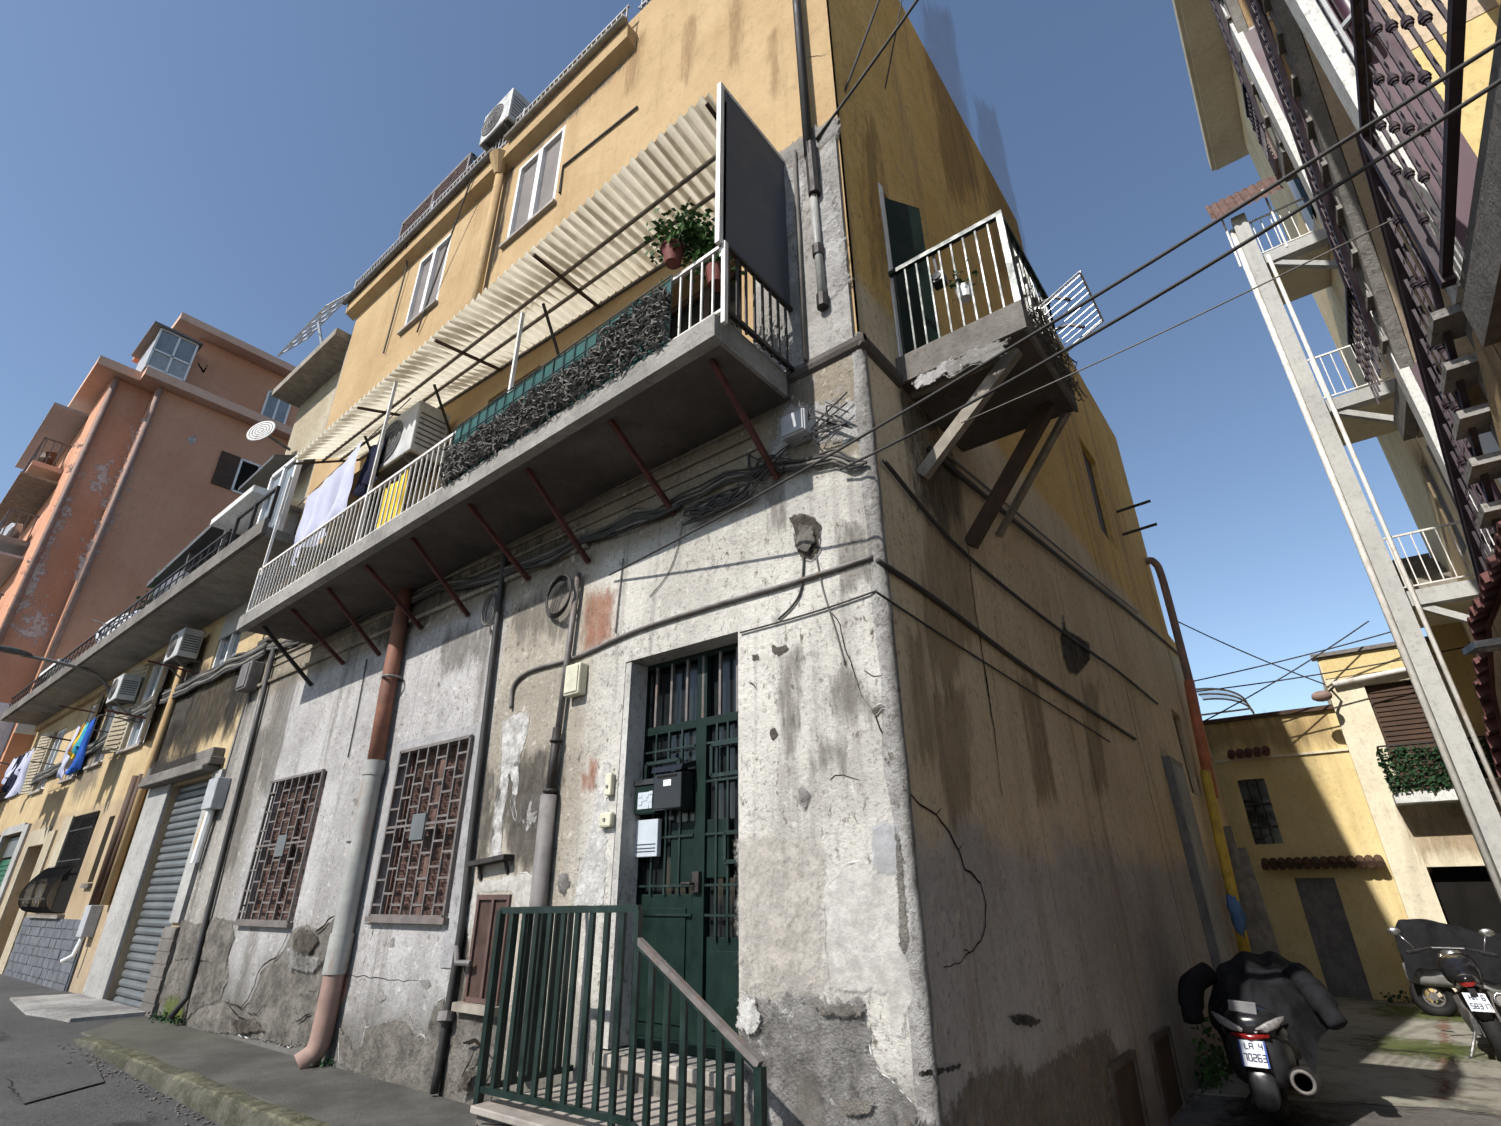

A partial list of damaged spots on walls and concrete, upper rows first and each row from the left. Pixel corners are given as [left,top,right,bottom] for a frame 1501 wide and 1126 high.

spalling [912,339,1008,389]
peeling [6,419,151,647]
spalling [789,513,821,562]
water stain [150,656,252,775]
corrosion [585,595,611,647]
crack [832,613,883,735]
crack [967,544,1002,793]
peeling [490,710,537,856]
crack [903,786,987,968]
spalling [158,916,335,1048]